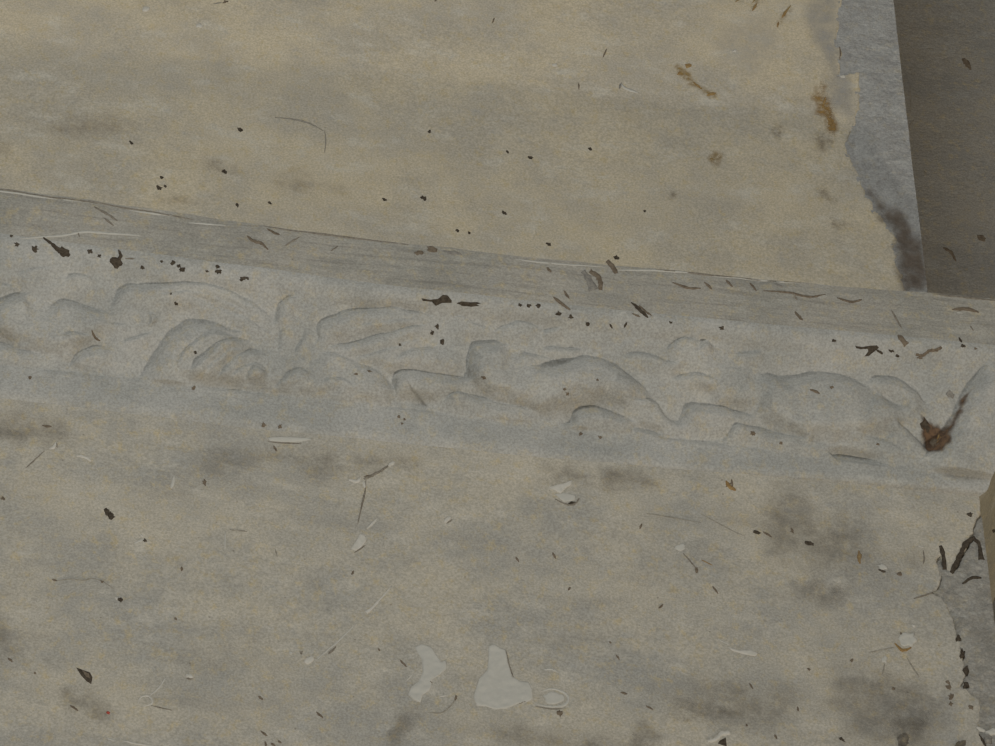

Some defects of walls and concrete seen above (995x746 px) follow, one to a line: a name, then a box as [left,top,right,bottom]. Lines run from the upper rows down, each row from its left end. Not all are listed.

corrosion [677,64,716,96]
corrosion [814,96,837,131]
flaking render [834,0,995,313]
spalling [0,189,223,226]
spalling [264,226,462,255]
peeling [855,345,899,357]
corrosion [920,395,967,451]
flaking render [933,511,995,746]
peeling [407,644,458,714]
peeling [474,644,570,710]